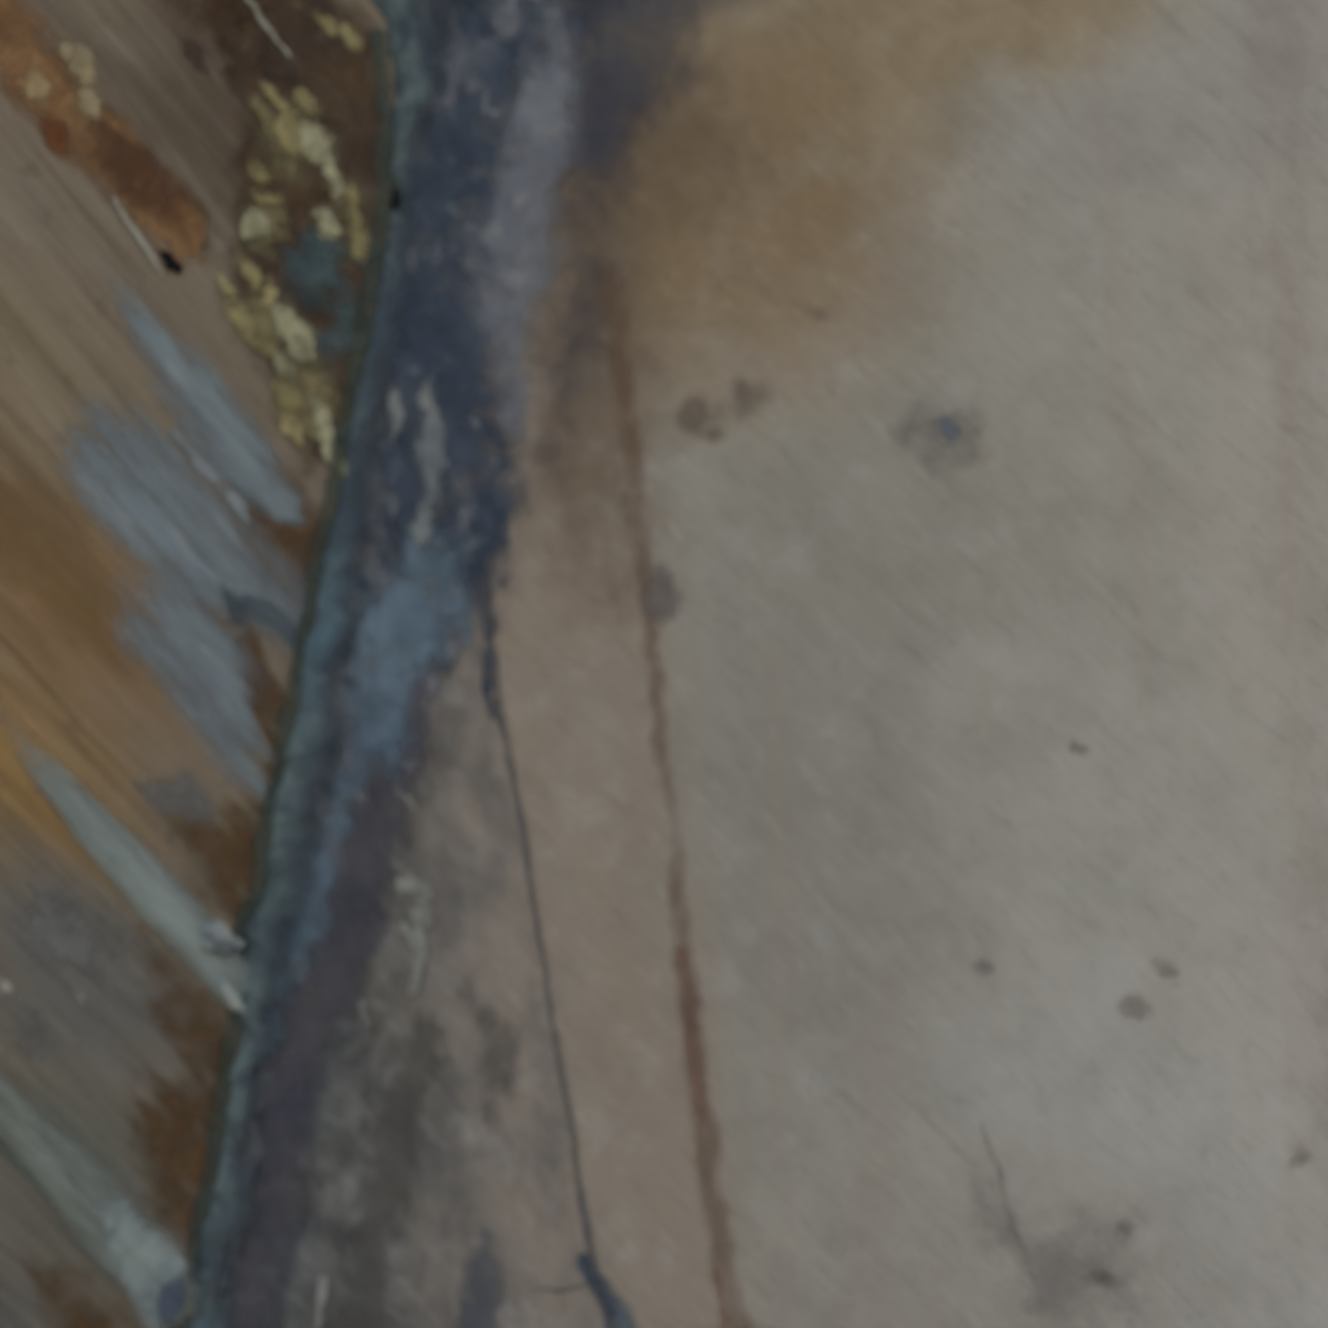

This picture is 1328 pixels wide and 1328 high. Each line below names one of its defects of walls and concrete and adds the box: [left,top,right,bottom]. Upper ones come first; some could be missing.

corrosion [42,119,67,154]
leakage [172,430,250,524]
leakage [223,0,693,1328]
crack [480,577,611,1328]